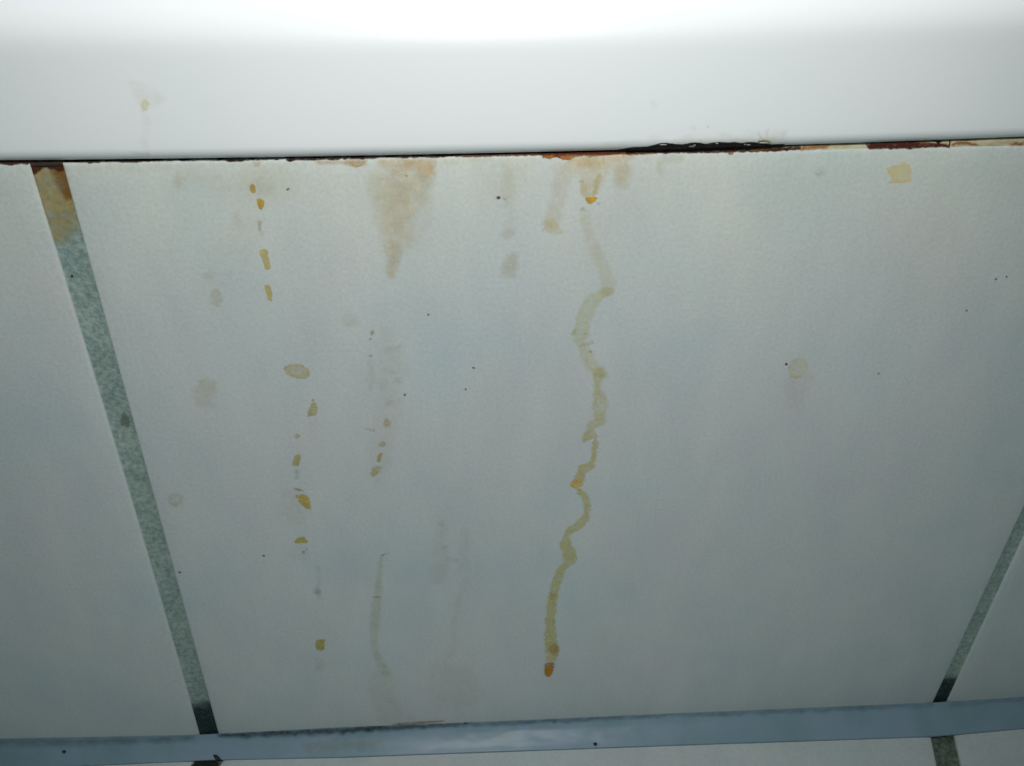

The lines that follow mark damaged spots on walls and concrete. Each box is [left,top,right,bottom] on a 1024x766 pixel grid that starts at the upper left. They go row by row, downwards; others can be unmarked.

rust [867,141,977,149]
rust [214,139,829,172]
rust [1,160,150,238]
damp [260,249,270,269]
damp [296,495,310,509]